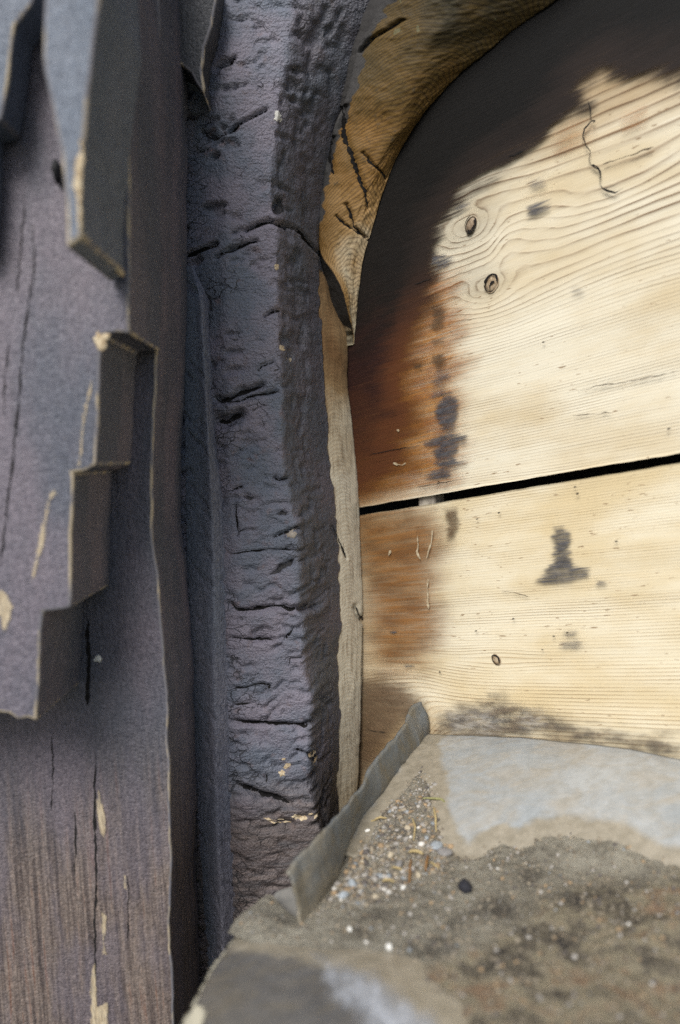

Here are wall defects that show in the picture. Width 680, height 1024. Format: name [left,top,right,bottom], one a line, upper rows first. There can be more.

crack [328,109,385,238]
crack [582,102,653,194]
damp [426,354,468,480]
damp [359,509,457,667]
damp [536,526,588,583]
crack [84,619,92,705]
crack [50,739,97,980]
crack [124,877,132,940]